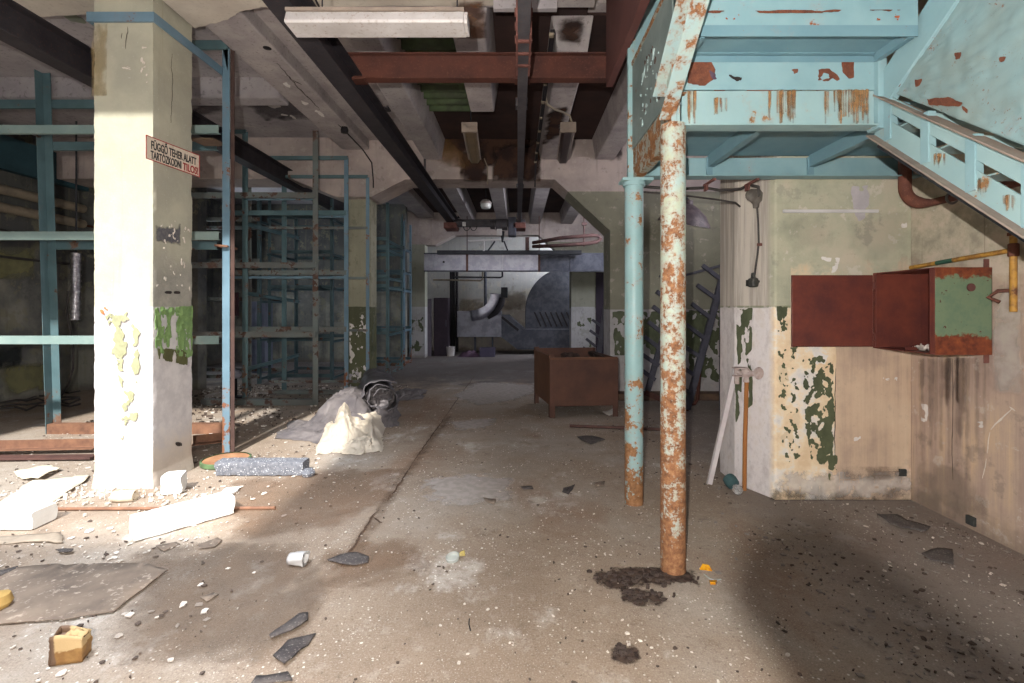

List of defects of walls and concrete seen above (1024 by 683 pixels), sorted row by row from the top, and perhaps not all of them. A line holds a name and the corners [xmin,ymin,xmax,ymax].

rust [687,62,796,124]
rust [816,62,869,124]
rust [927,97,968,113]
peeling [105,312,140,440]
peeling [155,258,193,367]
spalling [349,311,375,387]
peeling [735,308,753,422]
peeling [776,306,788,332]
peeling [777,347,838,480]
crack [341,377,474,566]